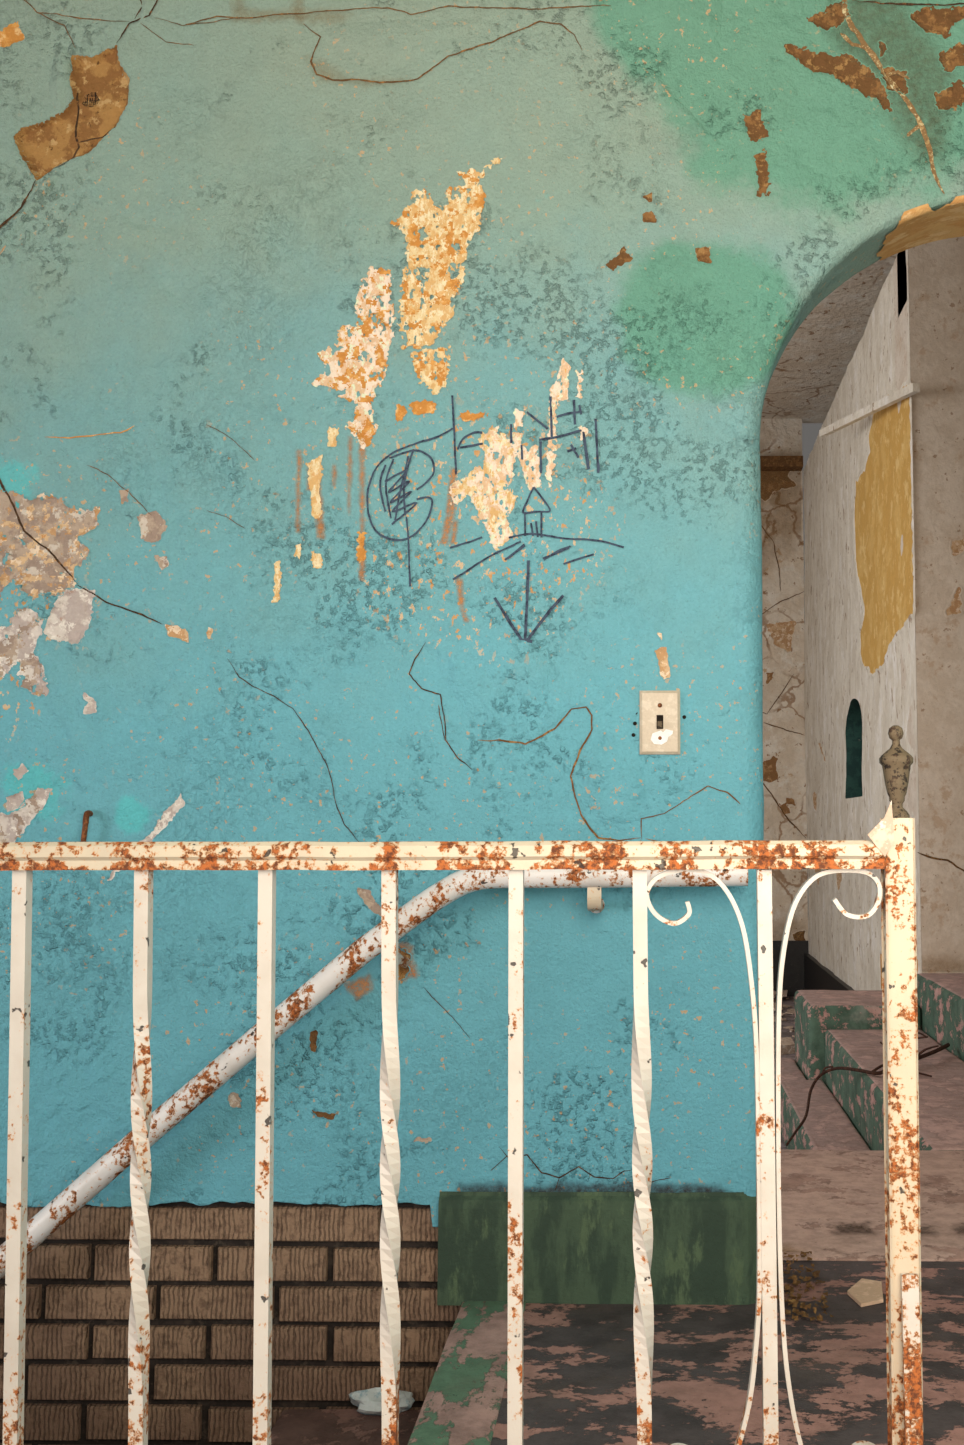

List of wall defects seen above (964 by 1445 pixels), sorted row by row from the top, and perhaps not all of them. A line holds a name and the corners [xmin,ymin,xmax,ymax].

crack [0,92,116,228]
spalling [12,44,131,181]
crack [24,0,610,84]
spalling [782,40,910,113]
crack [840,0,964,194]
peeling [305,158,502,519]
peeling [0,488,102,698]
crack [0,479,161,624]
crack [88,465,151,515]
peeling [449,358,584,551]
crack [762,526,803,614]
peeling [853,380,916,678]